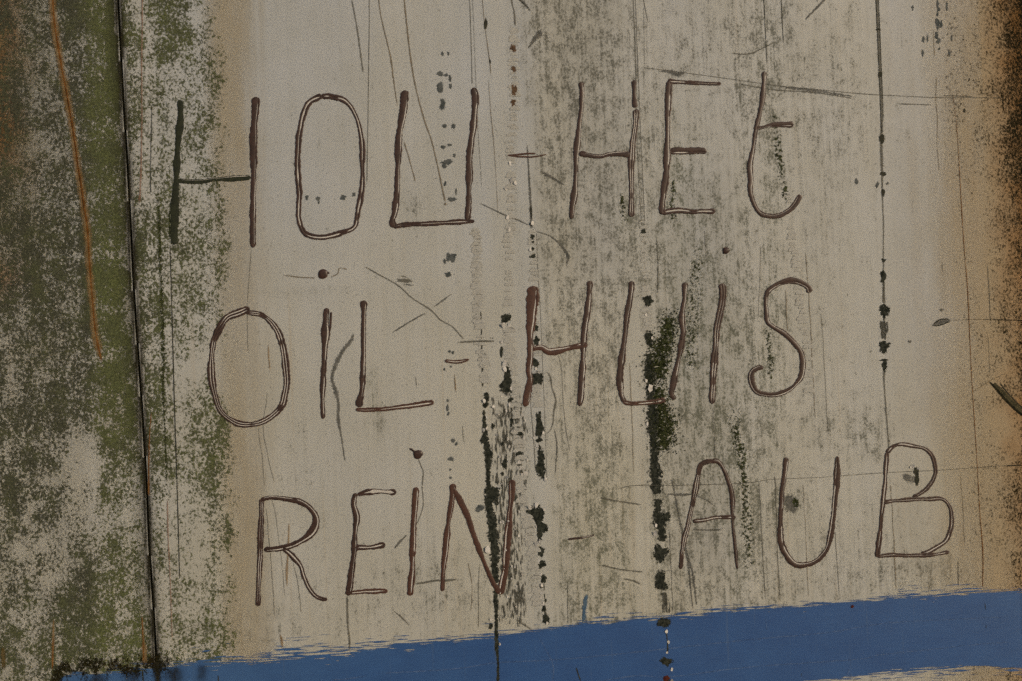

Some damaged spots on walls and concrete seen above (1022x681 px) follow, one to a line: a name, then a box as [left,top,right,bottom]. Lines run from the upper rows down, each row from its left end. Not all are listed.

corrosion [50,0,102,360]
leakage [150,173,180,628]
crack [876,0,891,448]
corrosion [943,0,1022,593]
corrosion [969,666,1022,681]